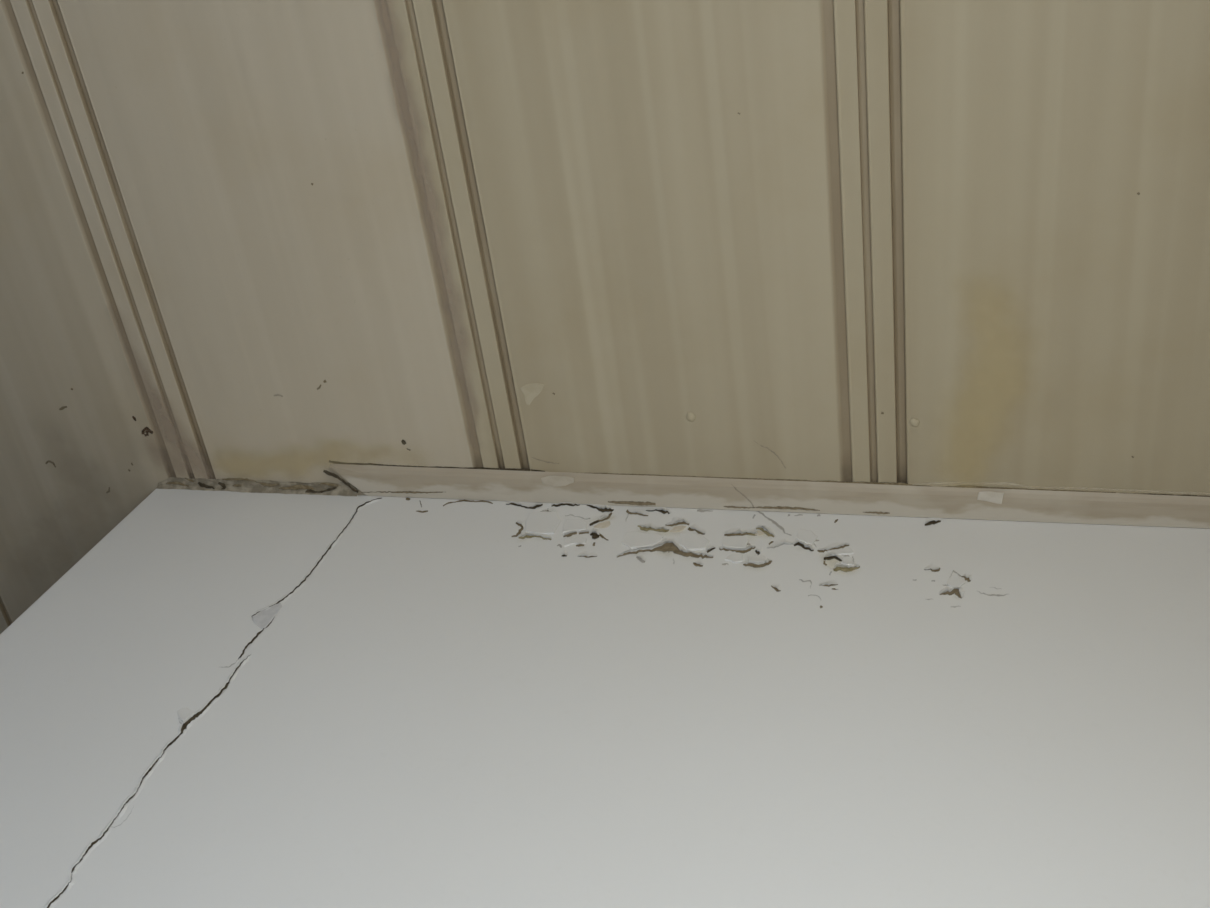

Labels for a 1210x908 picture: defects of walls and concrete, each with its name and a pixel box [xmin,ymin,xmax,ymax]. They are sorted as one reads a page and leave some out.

crack [591,473,1210,514]
peeling [506,501,860,590]
peeling [924,562,972,598]
crack [43,460,545,908]